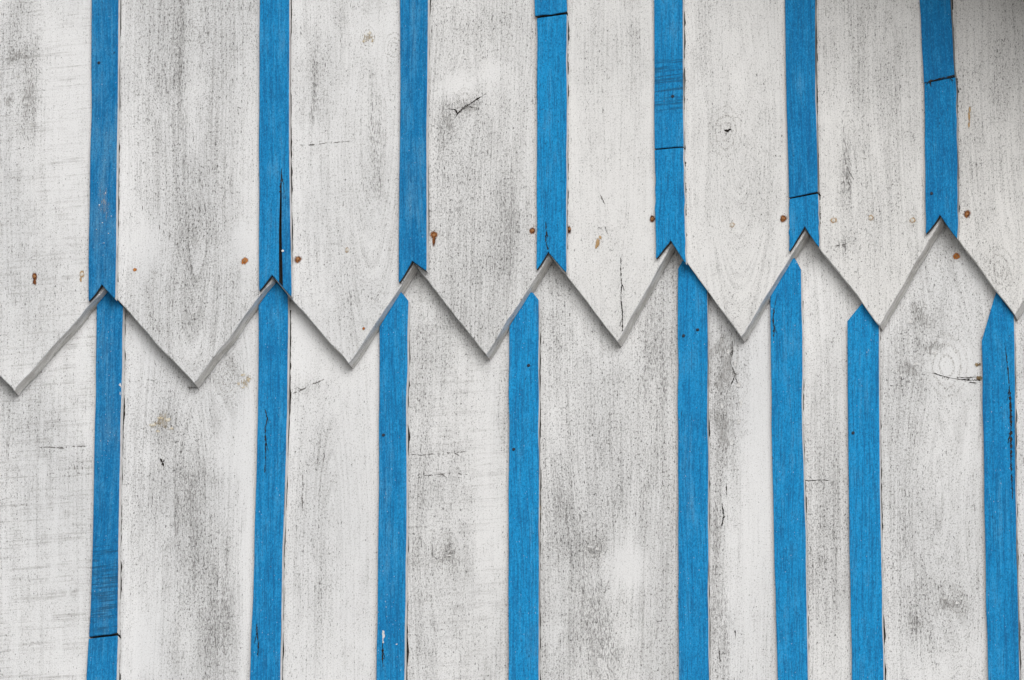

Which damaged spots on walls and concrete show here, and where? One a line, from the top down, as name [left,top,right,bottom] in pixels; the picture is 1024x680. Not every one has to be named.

crack [453,94,485,116]
crack [934,373,982,383]